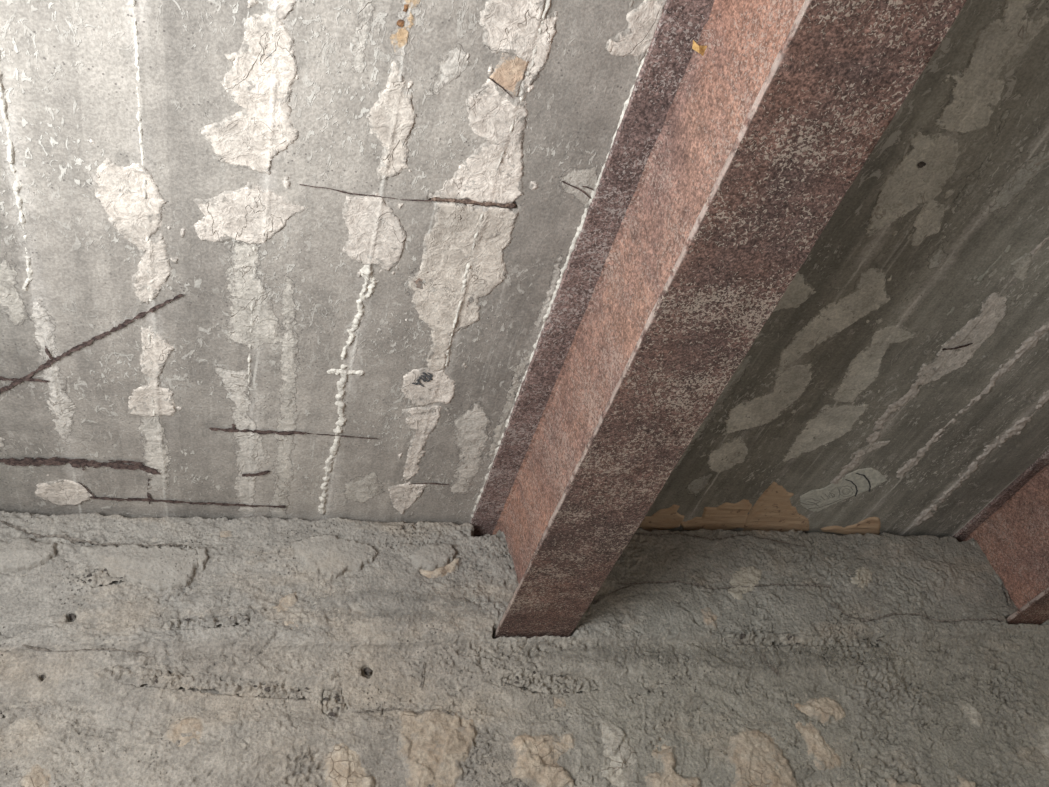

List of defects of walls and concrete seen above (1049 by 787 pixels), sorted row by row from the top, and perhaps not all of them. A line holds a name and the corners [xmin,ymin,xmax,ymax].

corrosion [390,0,420,56]
peeling [0,252,76,444]
crack [0,294,183,393]
crack [0,457,286,508]
spalling [92,0,306,519]
crack [209,424,378,439]
crack [299,184,433,201]
spalling [342,0,558,515]
spalling [687,263,921,497]
spalling [865,0,1049,269]
spalling [901,252,1034,387]
flaking render [394,706,480,787]